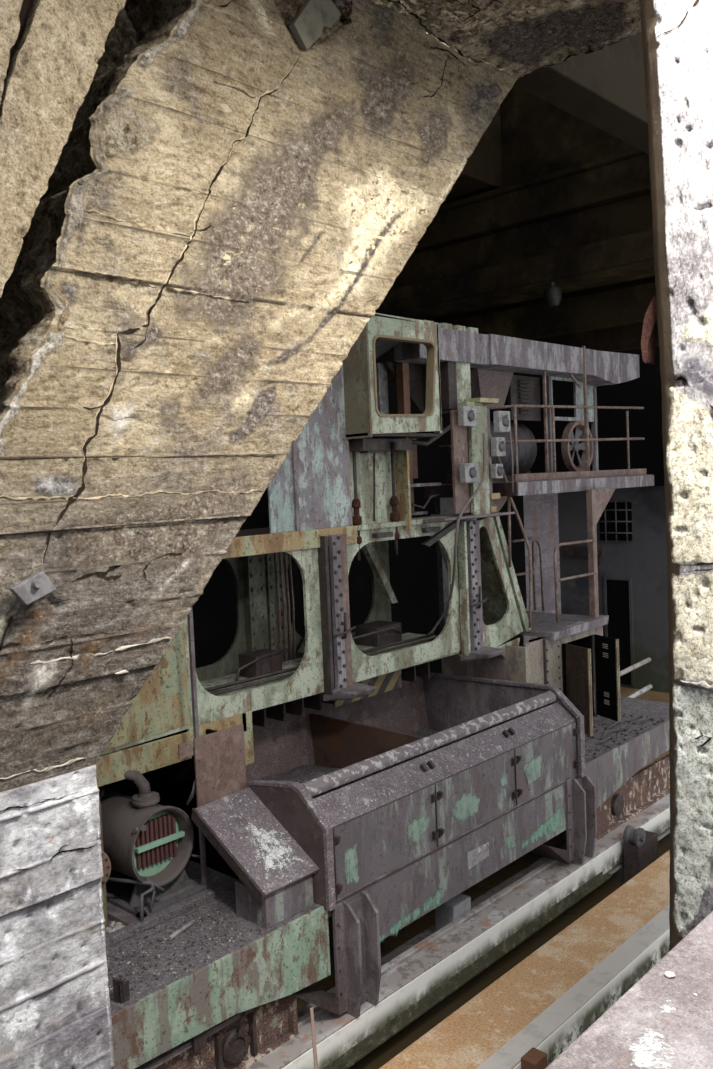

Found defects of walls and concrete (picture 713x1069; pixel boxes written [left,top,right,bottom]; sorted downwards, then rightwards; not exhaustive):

crack [521,0,699,76]
spalling [0,85,158,456]
crack [41,56,300,569]
crack [0,616,116,699]